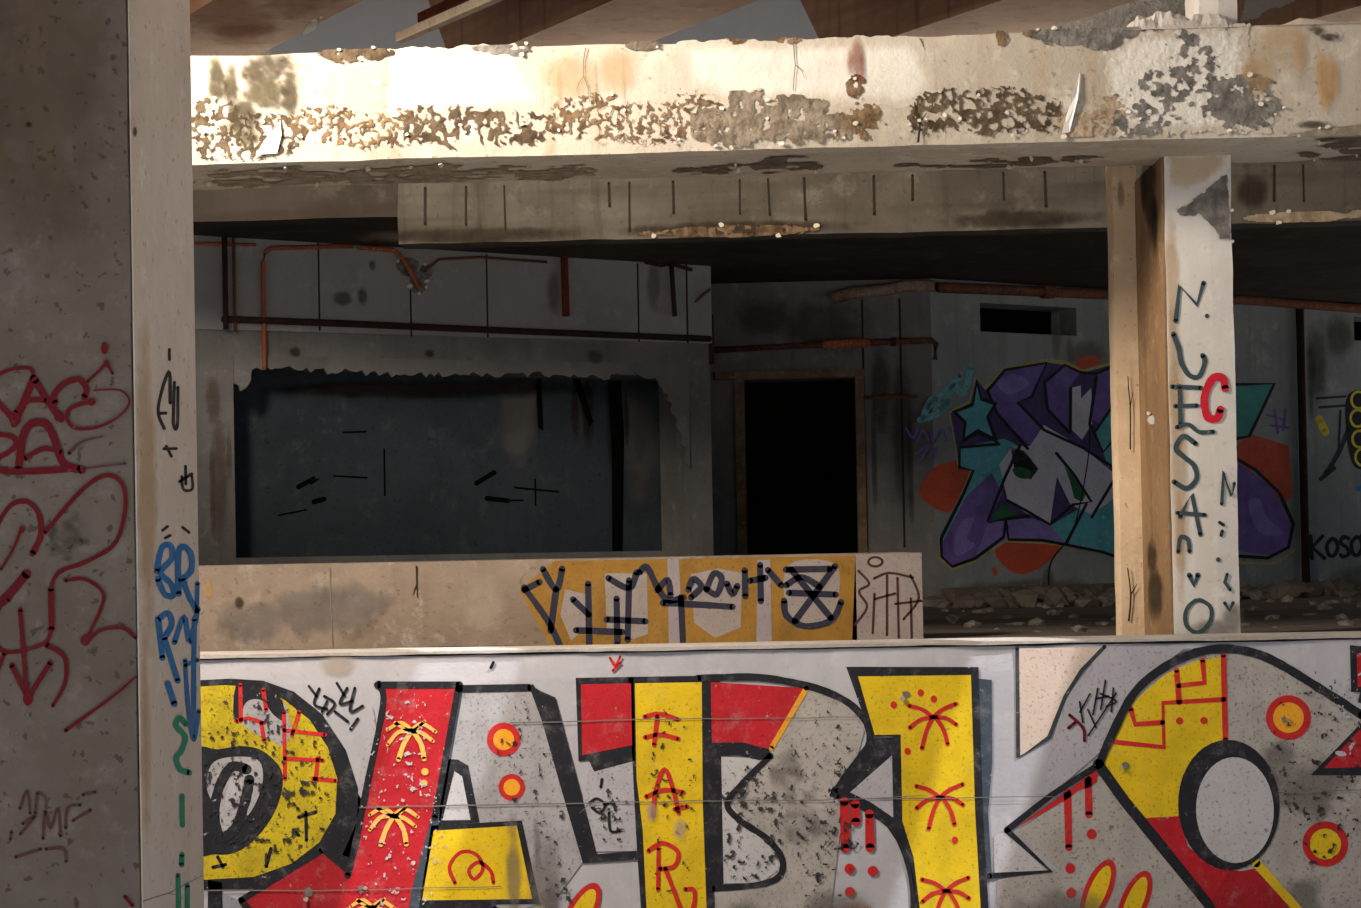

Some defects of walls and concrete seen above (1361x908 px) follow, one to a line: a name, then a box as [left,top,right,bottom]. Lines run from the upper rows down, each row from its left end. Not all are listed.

leakage [209,50,296,145]
spalling [192,74,884,189]
peeling [893,156,1104,169]
peeling [1288,124,1361,161]
spalling [1175,175,1361,243]